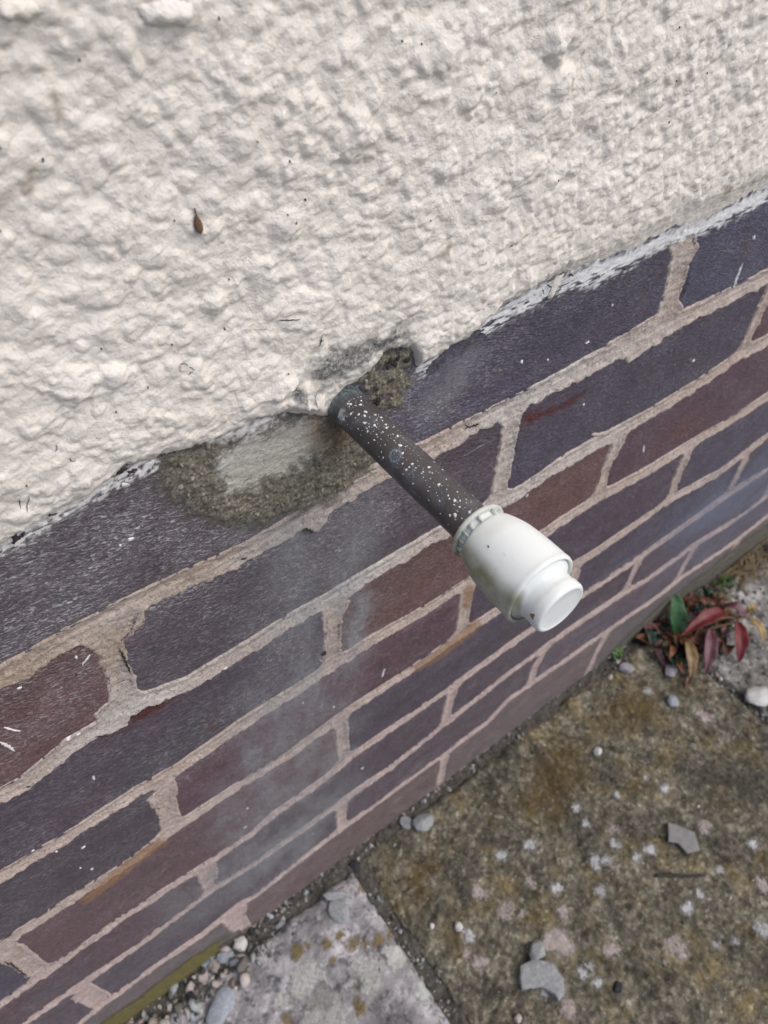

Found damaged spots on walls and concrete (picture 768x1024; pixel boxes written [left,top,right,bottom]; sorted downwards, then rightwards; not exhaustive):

spalling [357,346,414,413]
spalling [0,387,373,557]